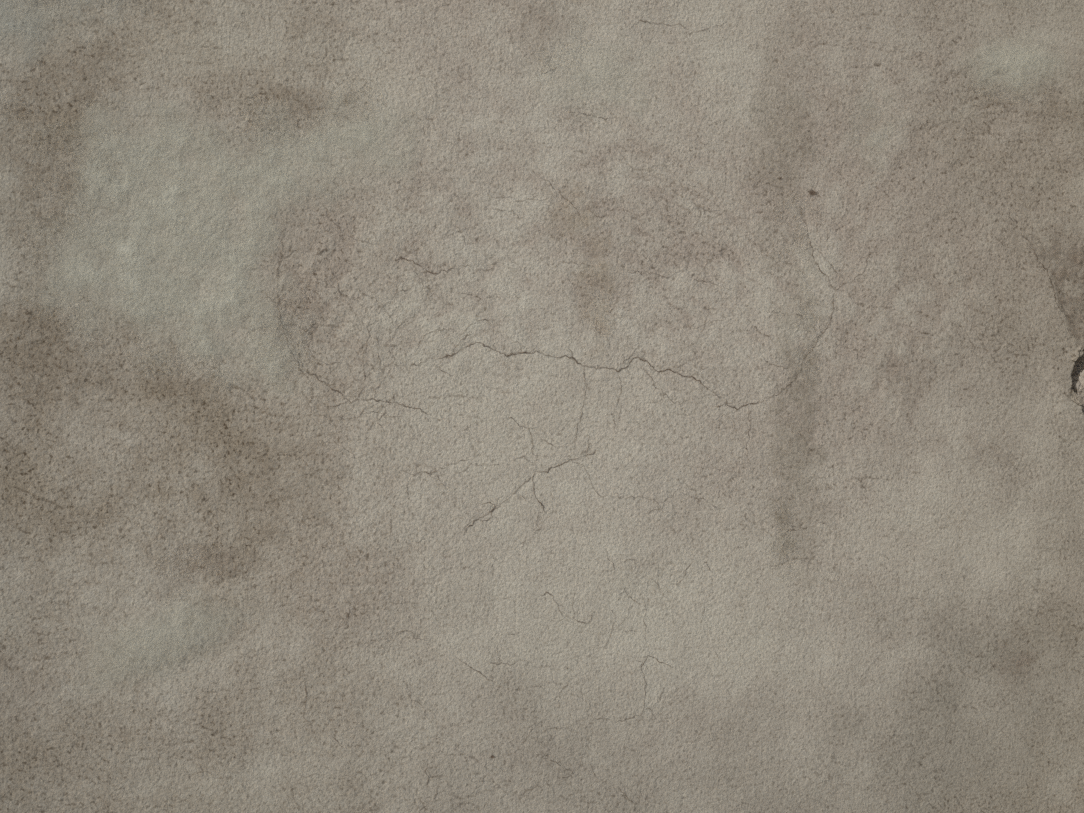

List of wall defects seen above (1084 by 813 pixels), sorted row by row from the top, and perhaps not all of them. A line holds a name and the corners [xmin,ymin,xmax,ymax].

crack [559,350,701,394]
spalling [1070,346,1084,413]